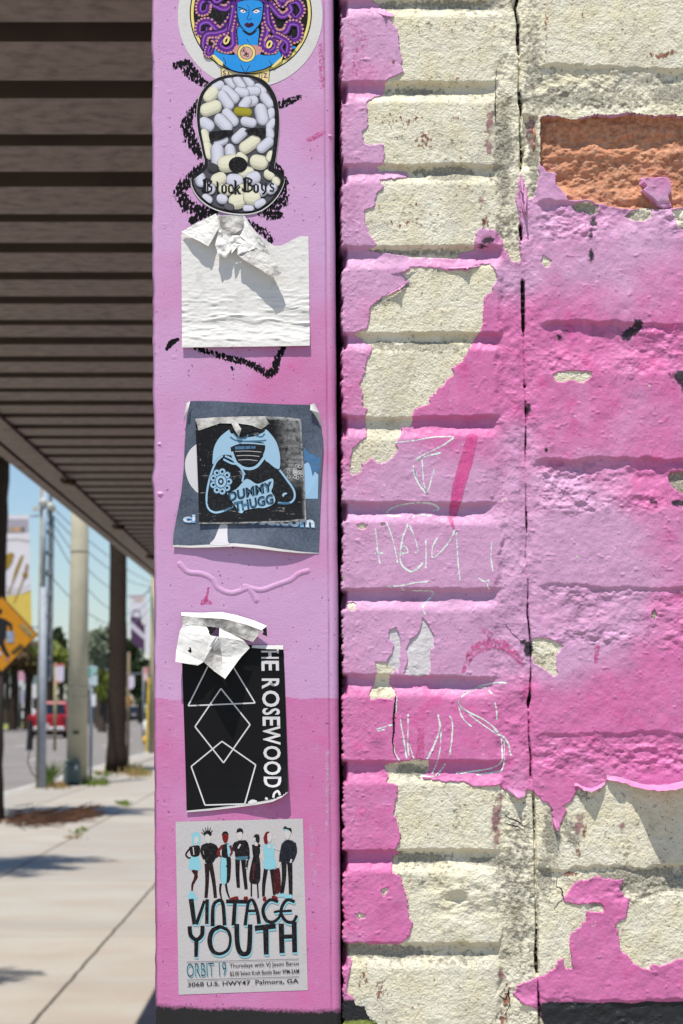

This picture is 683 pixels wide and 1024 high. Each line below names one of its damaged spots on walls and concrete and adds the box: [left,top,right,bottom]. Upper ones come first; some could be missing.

crack [494,0,522,169]
peeling [349,0,683,476]
crack [519,280,527,337]
peeling [369,619,434,700]
crack [505,585,535,856]
peeling [531,638,563,676]
peeling [343,759,683,1024]
crack [534,879,564,1016]